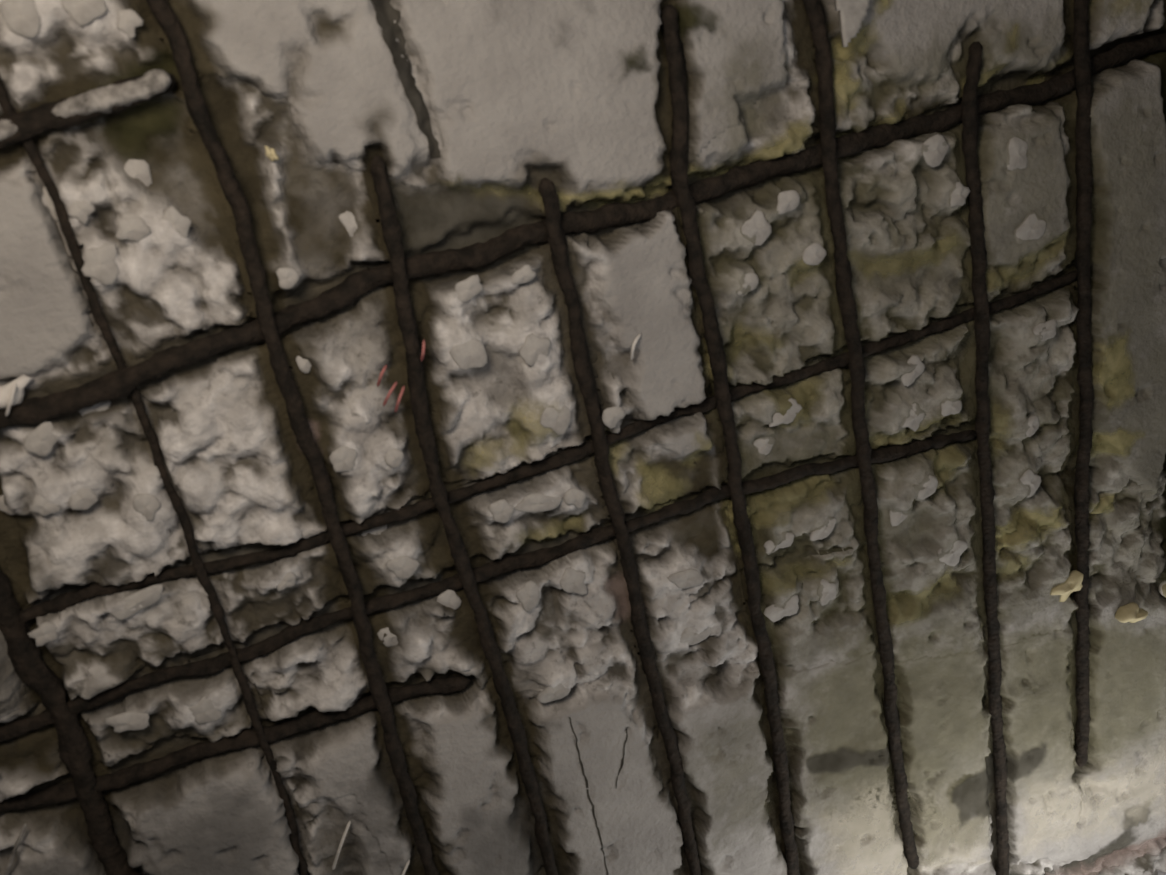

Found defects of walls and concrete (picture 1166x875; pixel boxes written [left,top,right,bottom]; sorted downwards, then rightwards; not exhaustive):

spalling [0,0,391,875]
crack [371,0,441,159]
spalling [146,0,701,875]
spalling [561,0,1166,875]